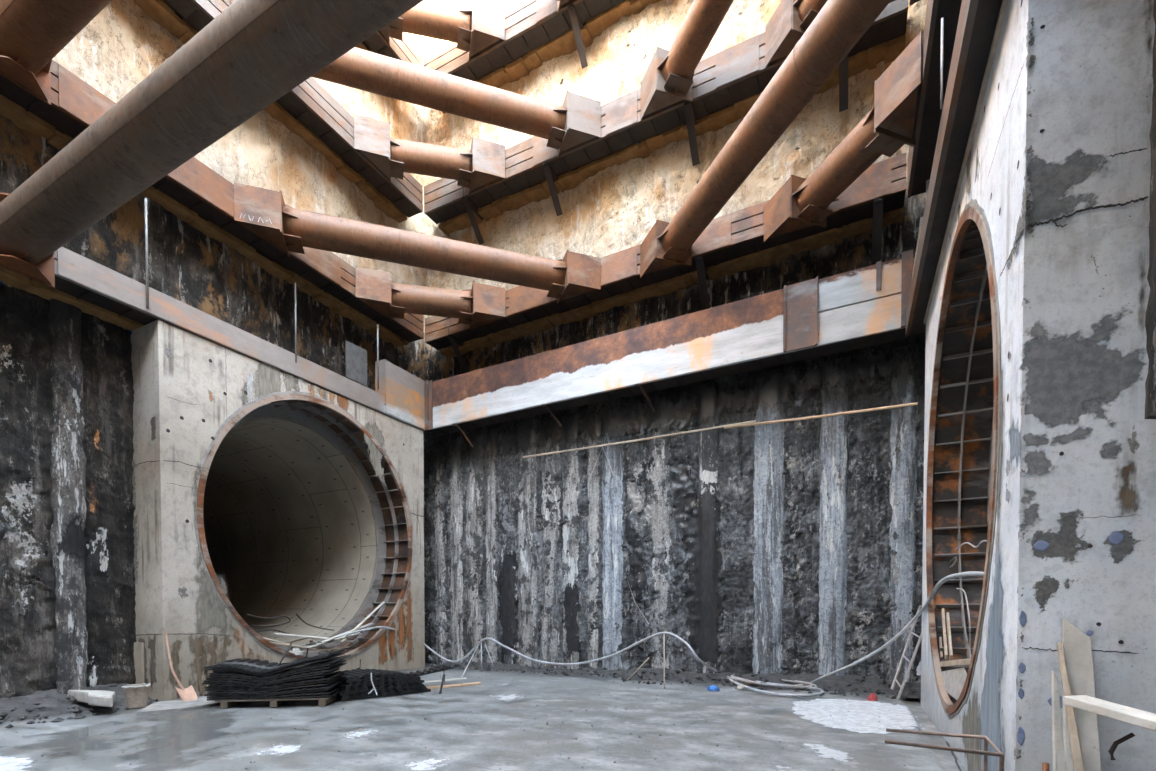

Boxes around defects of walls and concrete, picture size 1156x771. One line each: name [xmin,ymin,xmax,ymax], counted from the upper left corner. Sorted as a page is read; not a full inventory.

spalling [1026,18,1036,68]
crack [1108,148,1147,157]
crack [1000,196,1149,276]
rust [1118,461,1138,514]
leakage [0,473,109,614]
rust [378,581,413,664]
leakage [495,552,519,664]
leakage [562,524,581,657]
leakage [86,656,98,687]